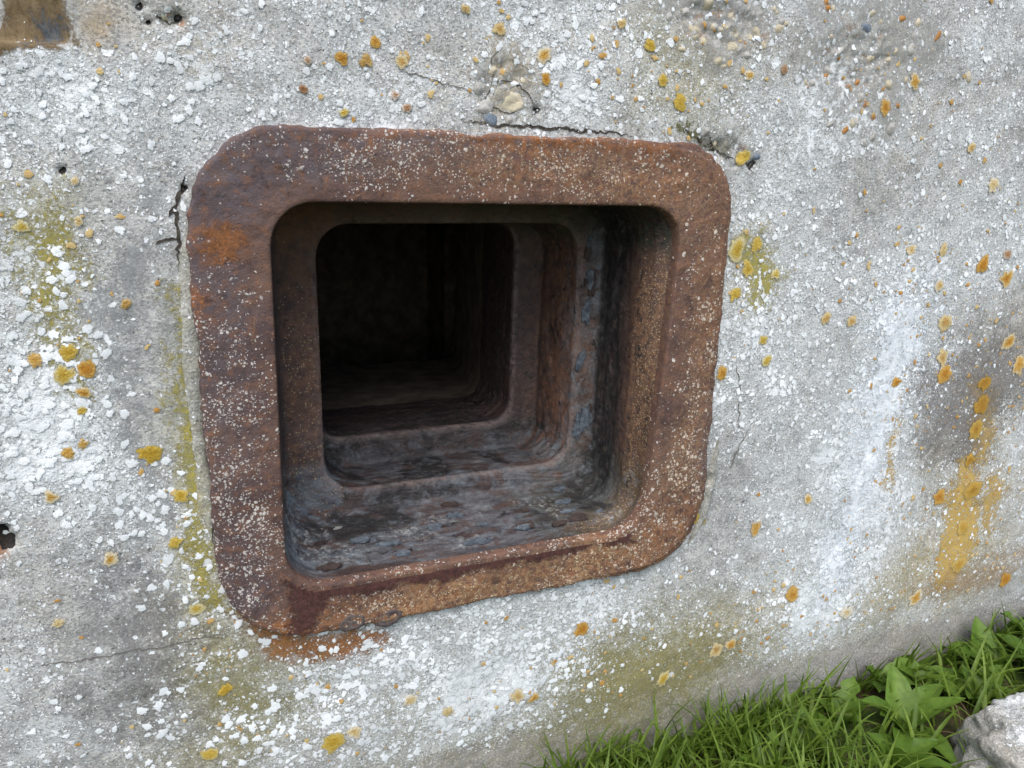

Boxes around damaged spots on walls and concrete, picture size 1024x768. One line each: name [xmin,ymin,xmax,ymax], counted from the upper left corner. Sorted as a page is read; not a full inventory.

crack [403,51,642,137]
corrosion [471,136,681,158]
crack [156,174,187,265]
corrosion [228,533,637,664]